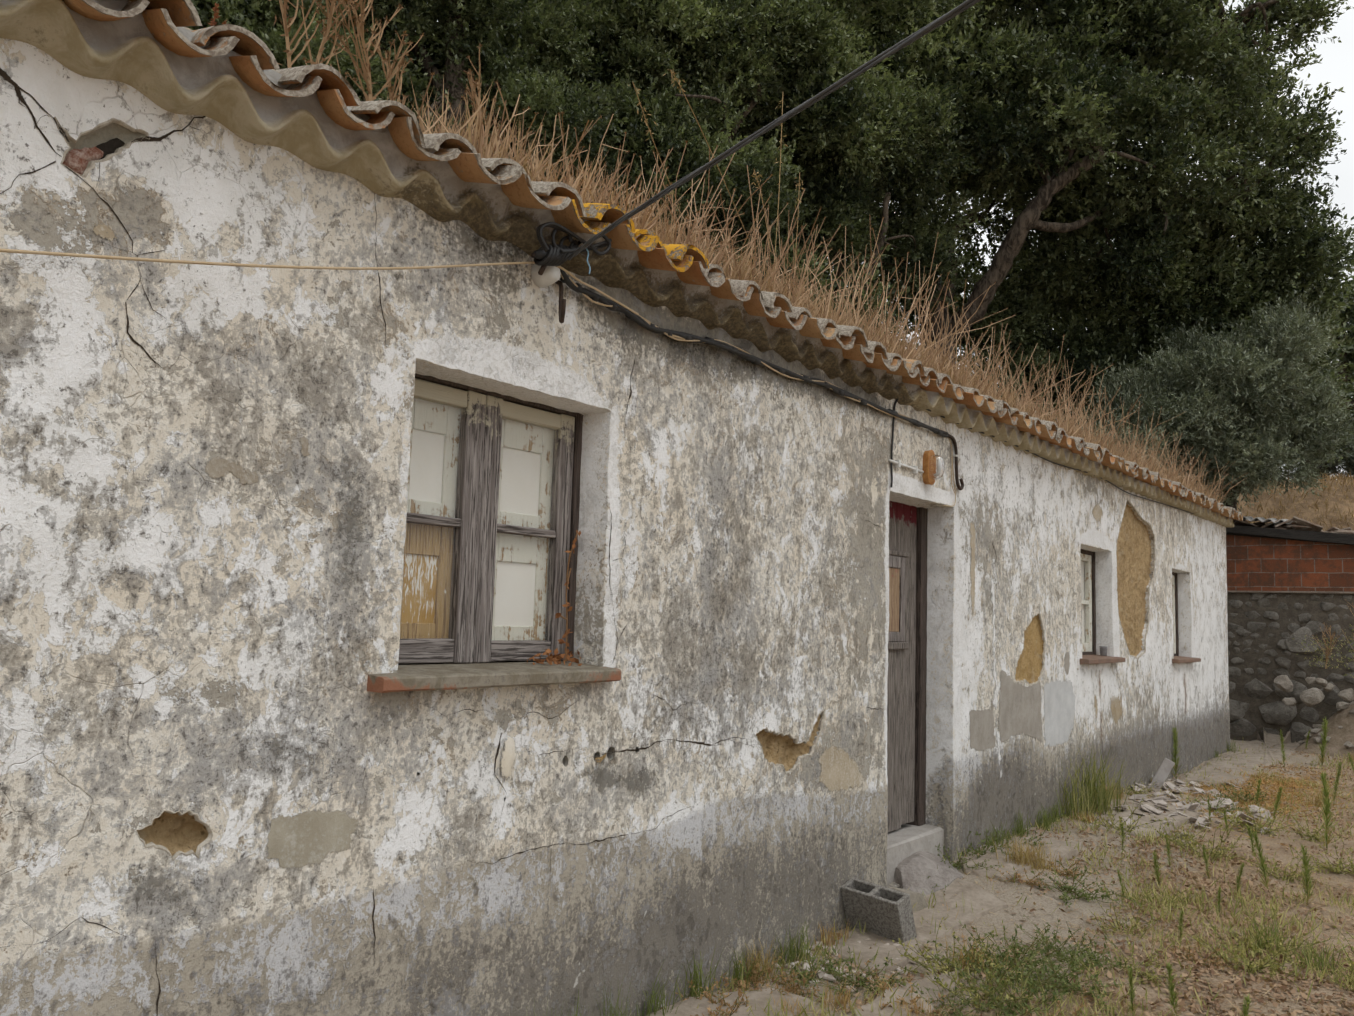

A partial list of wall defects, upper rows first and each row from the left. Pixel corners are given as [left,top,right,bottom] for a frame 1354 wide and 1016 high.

spalling [55,117,150,178]
crack [131,116,206,143]
crack [0,68,167,368]
spalling [1116,498,1156,659]
spalling [1015,612,1046,686]
crack [419,695,754,871]
damp [584,759,656,795]
spalling [755,707,863,793]
spalling [136,809,213,861]